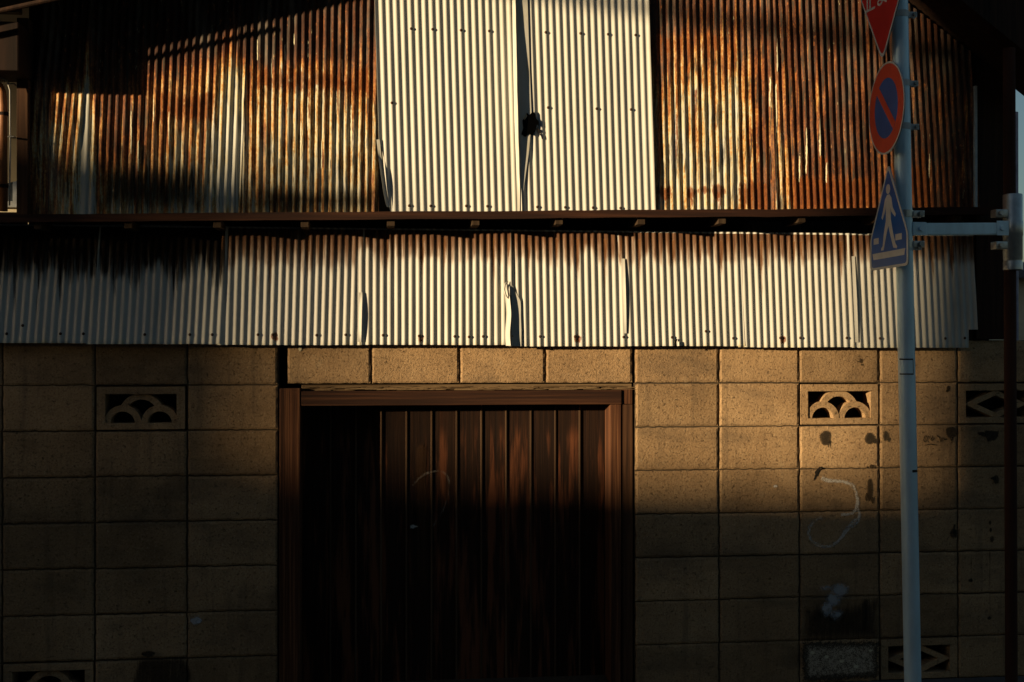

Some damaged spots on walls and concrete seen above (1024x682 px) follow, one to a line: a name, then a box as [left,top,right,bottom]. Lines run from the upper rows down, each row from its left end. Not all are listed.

corrosion [156,90,217,147]
corrosion [250,64,372,148]
corrosion [652,28,738,156]
corrosion [658,186,672,205]
corrosion [687,184,725,209]
corrosion [738,181,768,209]
corrosion [786,157,881,209]
corrosion [912,149,935,208]